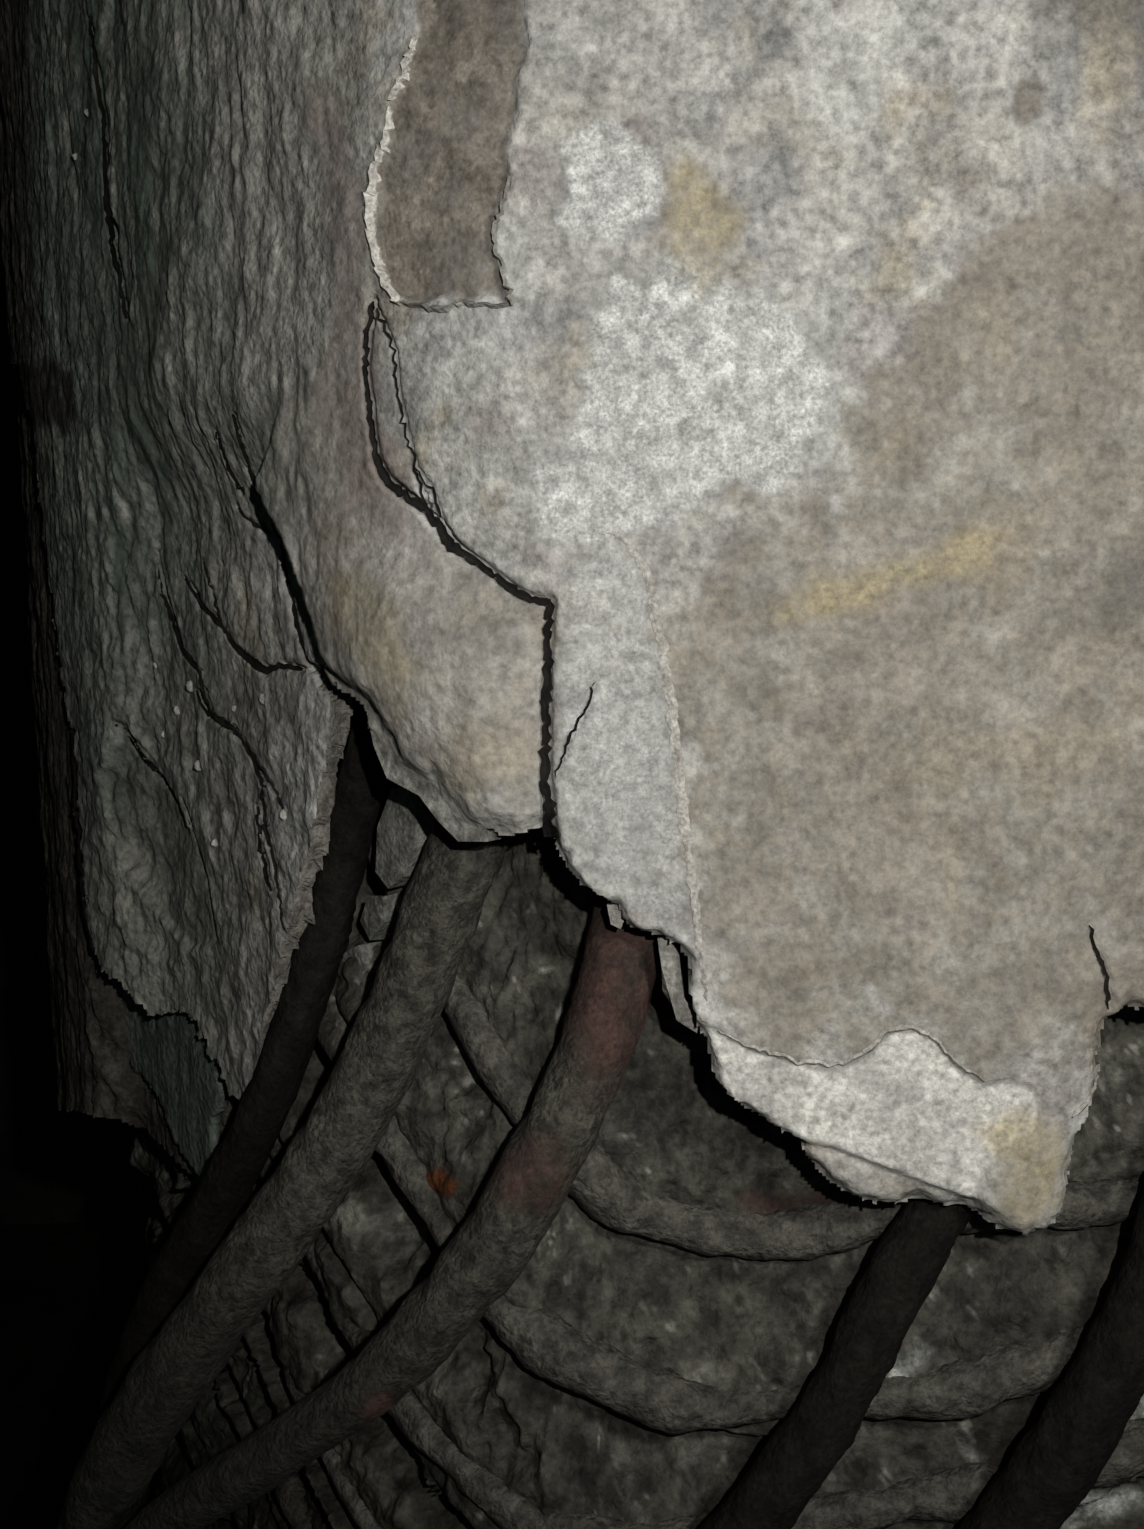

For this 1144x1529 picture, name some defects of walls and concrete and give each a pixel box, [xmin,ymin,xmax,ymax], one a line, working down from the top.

peeling [362,0,525,313]
crack [71,729,95,951]
crack [115,724,191,825]
crack [157,414,319,930]
spalling [249,665,625,1089]
crack [362,301,596,839]
spalling [156,1150,441,1496]
spalling [394,1008,517,1236]
spalling [412,1317,787,1525]
spalling [504,1193,881,1393]
spalling [595,934,1144,1377]
spalling [815,1376,1065,1495]